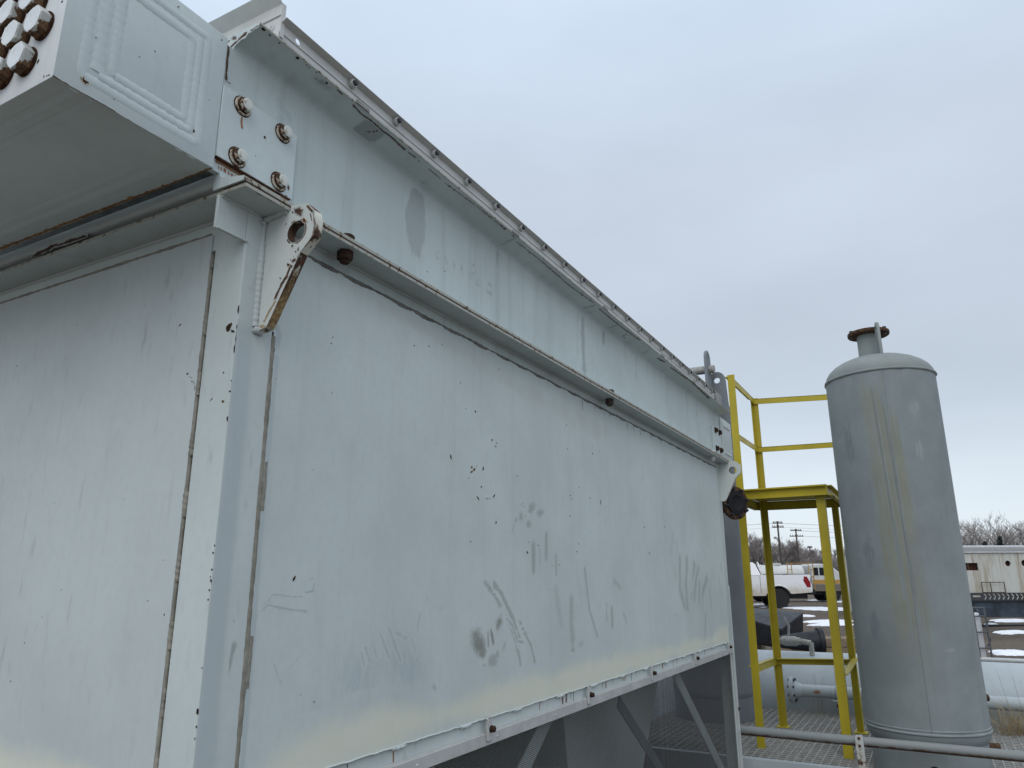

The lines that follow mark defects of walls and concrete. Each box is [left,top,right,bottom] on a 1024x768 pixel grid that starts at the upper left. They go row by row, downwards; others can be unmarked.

corrosion [0,155,321,330]